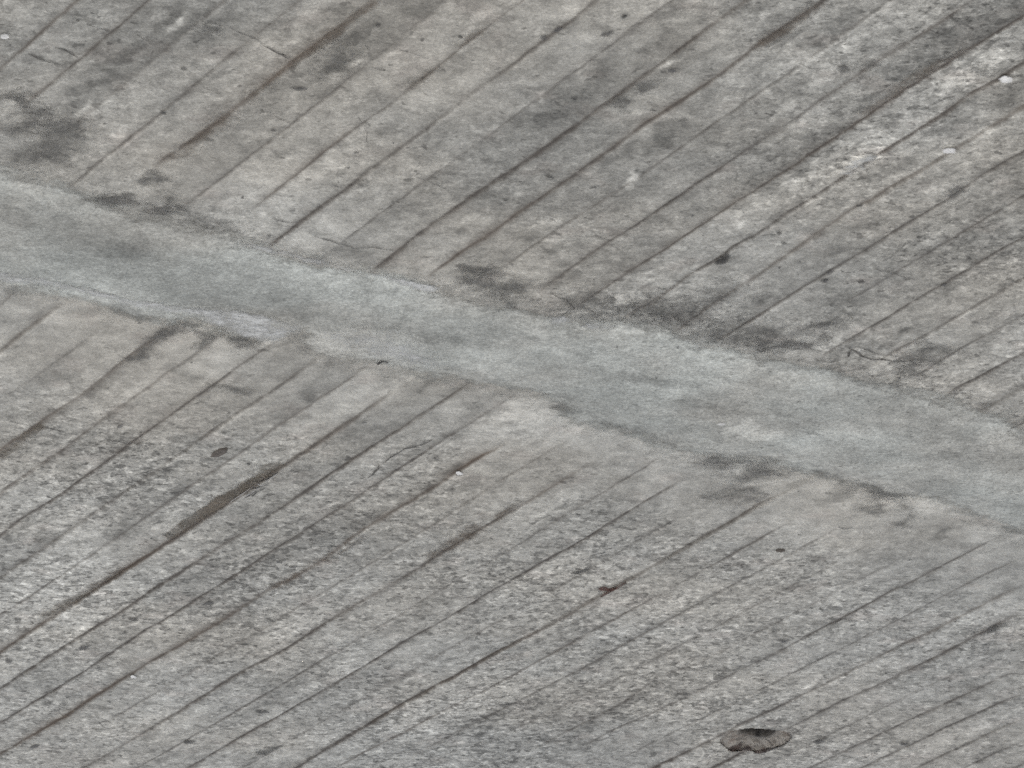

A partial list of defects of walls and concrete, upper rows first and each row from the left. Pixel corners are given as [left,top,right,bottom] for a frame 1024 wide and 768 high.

spalling [719,728,792,754]